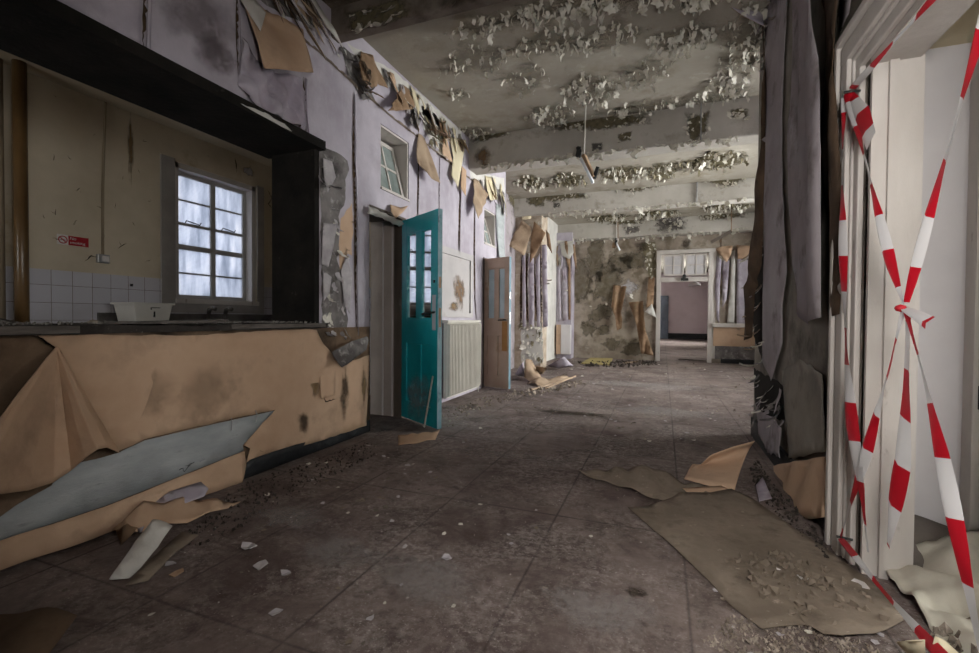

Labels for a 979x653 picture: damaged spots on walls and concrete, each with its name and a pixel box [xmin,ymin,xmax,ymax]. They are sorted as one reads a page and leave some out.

peeling [0,148,369,570]
peeling [339,0,851,519]